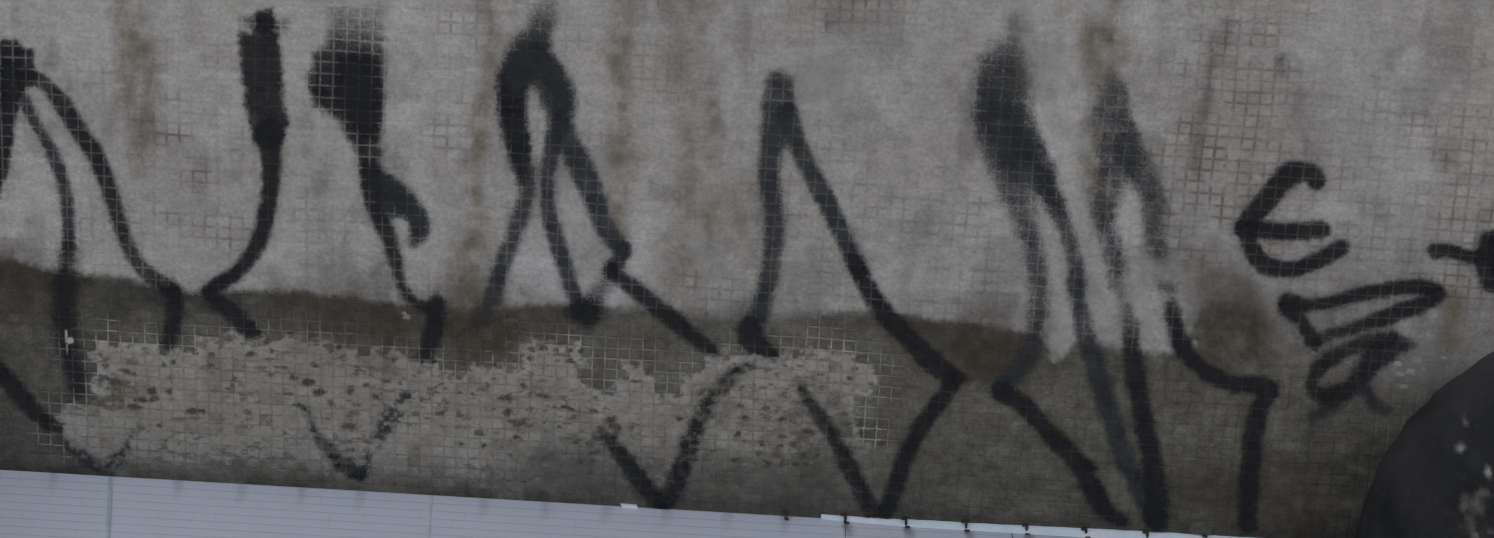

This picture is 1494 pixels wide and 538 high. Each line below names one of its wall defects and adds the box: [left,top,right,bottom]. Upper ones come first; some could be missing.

peeling [37,320,893,491]